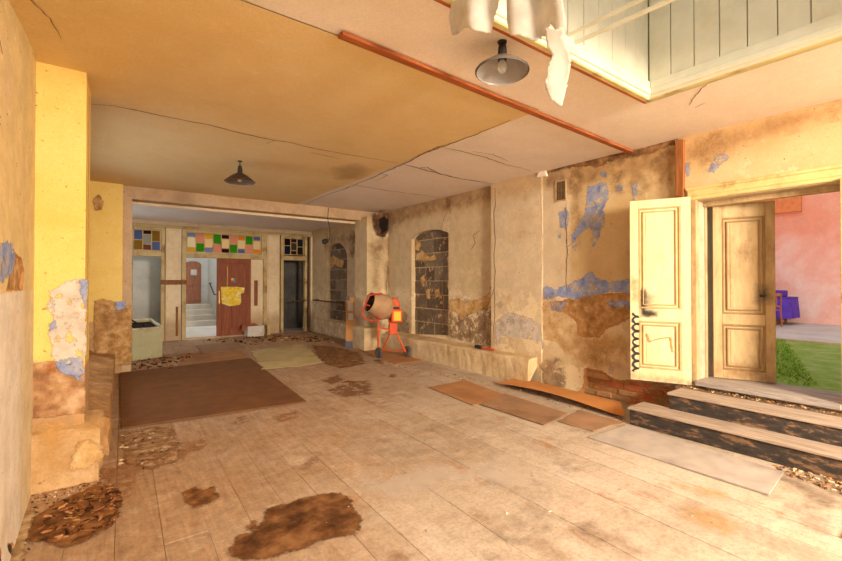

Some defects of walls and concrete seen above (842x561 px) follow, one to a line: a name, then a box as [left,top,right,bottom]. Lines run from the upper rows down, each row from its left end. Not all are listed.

crack [94,104,524,329]
peeling [537,139,677,251]
peeling [0,240,21,289]
spalling [33,278,133,418]
spalling [420,274,491,320]
peeling [495,312,544,350]
spalling [543,272,630,337]